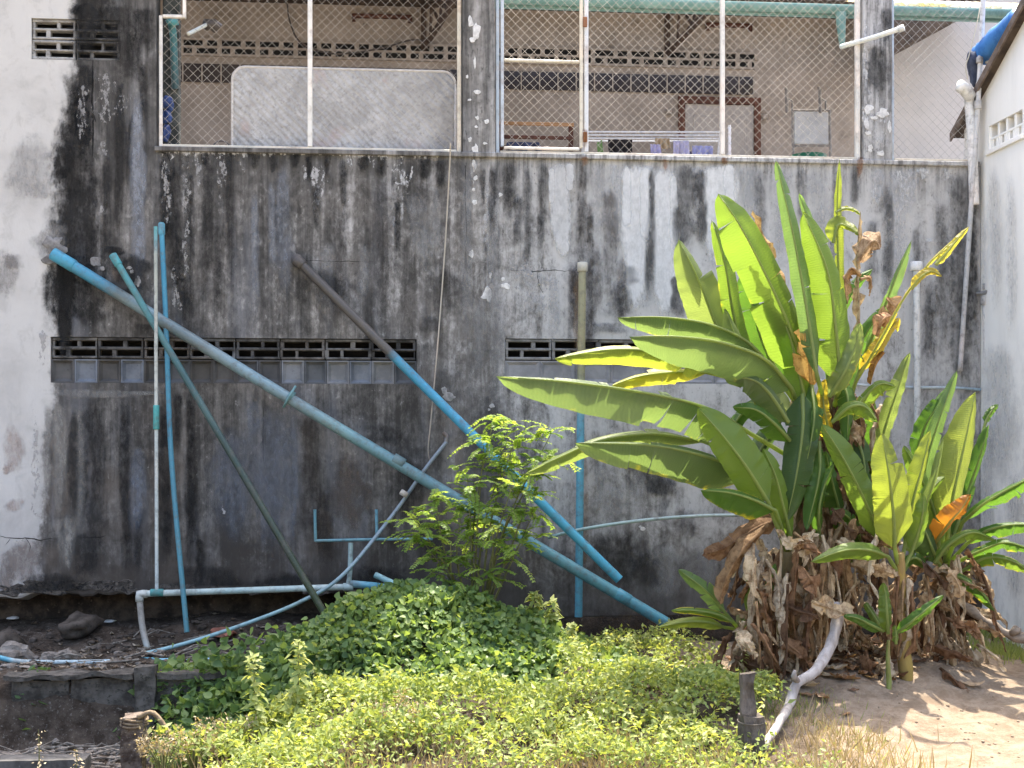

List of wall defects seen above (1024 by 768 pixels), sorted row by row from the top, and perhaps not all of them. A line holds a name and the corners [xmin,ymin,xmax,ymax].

leakage [11,0,150,356]
peeling [76,73,131,137]
leakage [159,153,233,316]
leakage [251,154,319,280]
leakage [360,160,445,291]
peeling [468,15,481,43]
leakage [462,164,765,360]
peeling [862,96,892,156]
leakage [868,10,891,88]
leakage [925,182,977,349]
leakage [0,390,154,591]
leakage [158,394,239,586]